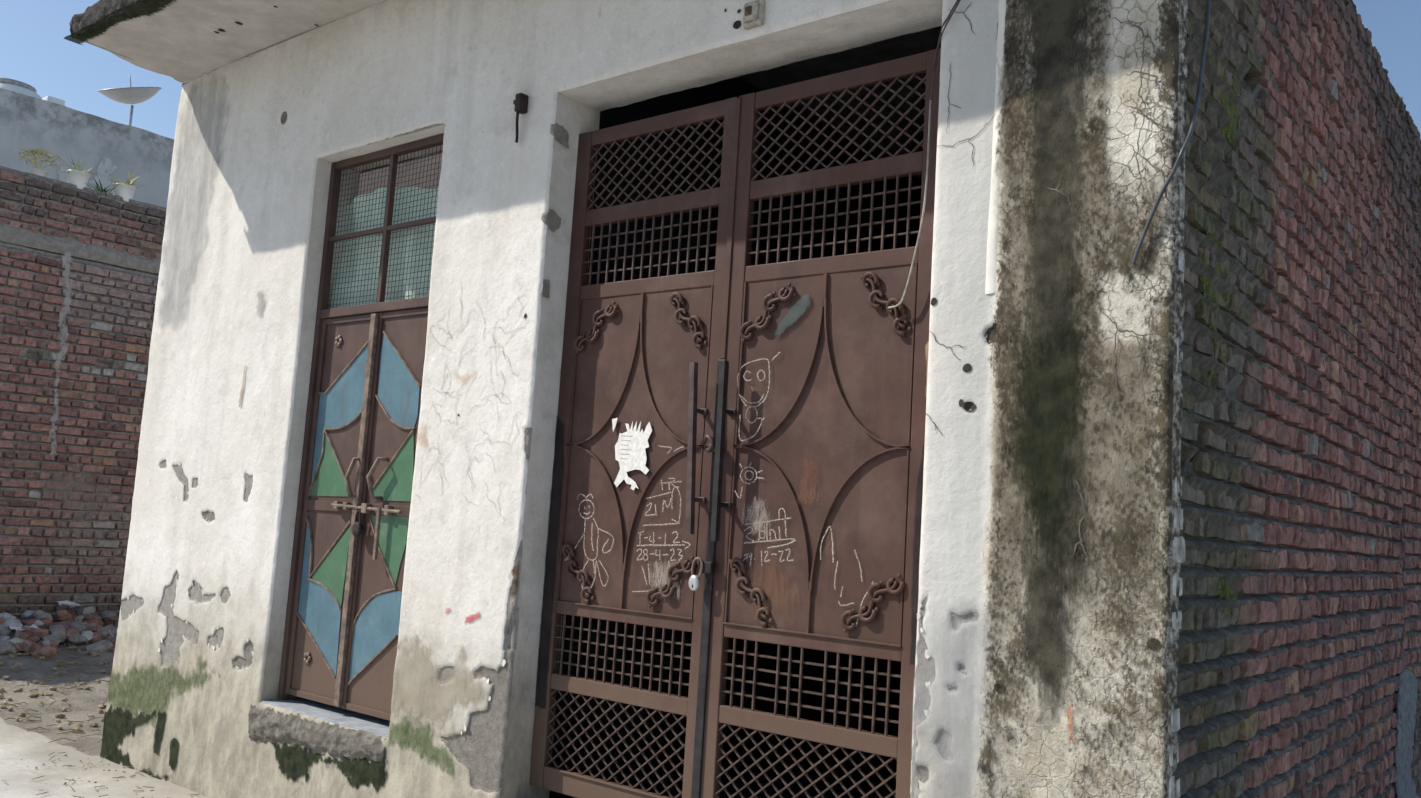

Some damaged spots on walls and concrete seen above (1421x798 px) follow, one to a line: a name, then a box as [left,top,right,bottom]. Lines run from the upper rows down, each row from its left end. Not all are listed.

crack [1112,17,1172,209]
peeling [159,460,198,502]
spalling [202,511,215,522]
peeling [243,473,253,502]
crack [415,272,532,517]
spalling [522,425,532,463]
damp [977,0,1180,798]
peeling [121,571,254,669]
spalling [439,523,524,792]